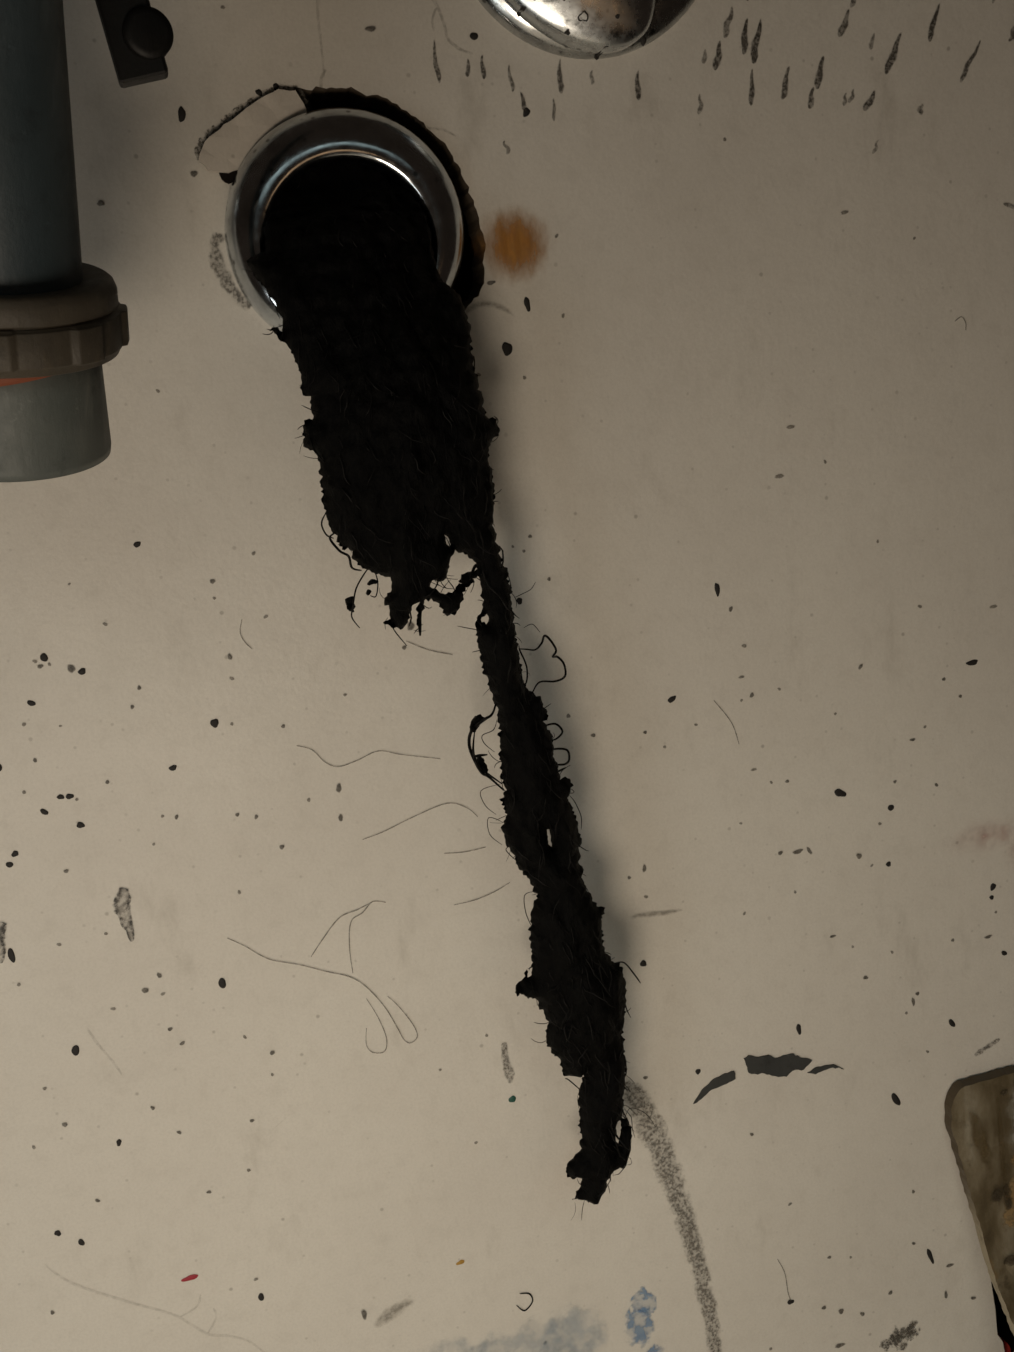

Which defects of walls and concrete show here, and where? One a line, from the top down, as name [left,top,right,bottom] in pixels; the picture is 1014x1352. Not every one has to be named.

peeling [195,86,309,184]
rust [492,218,540,271]
peeling [693,1053,842,1104]
damp [971,1090,1014,1227]